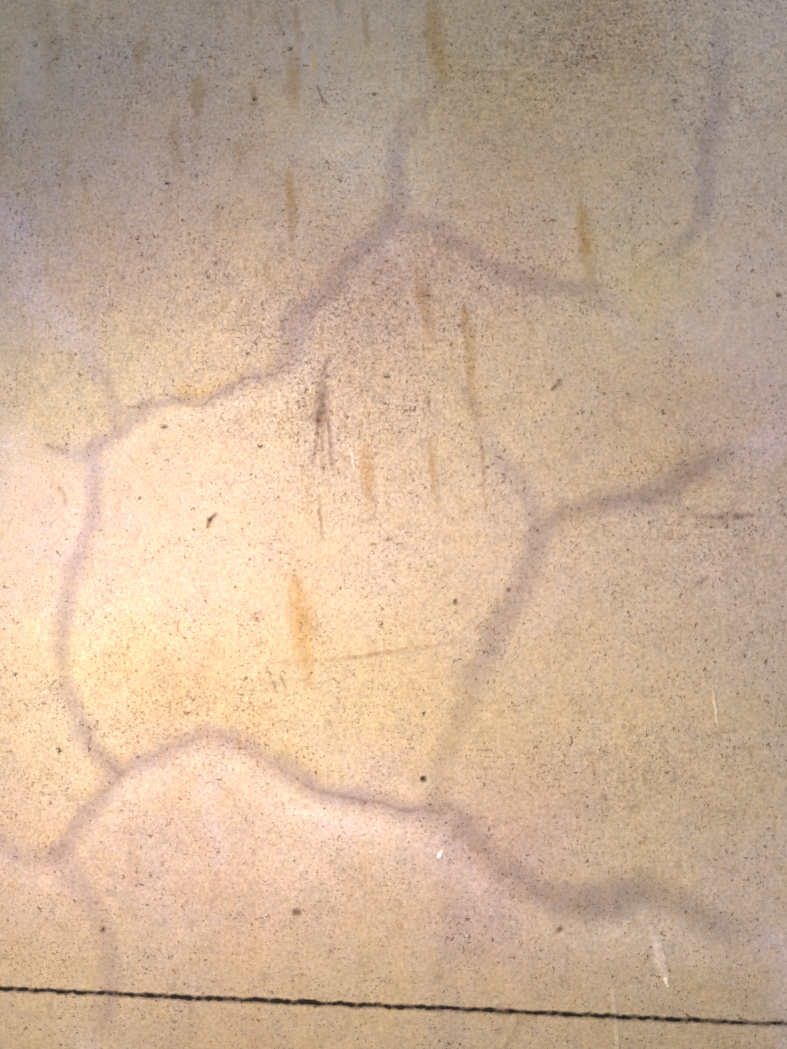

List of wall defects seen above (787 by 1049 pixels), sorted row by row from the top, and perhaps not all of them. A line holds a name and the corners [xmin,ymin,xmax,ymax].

corrosion [421,0,454,88]
crack [39,80,616,481]
corrosion [573,201,598,289]
damp [305,356,336,477]
damp [458,305,480,423]
damp [204,511,219,531]
damp [357,441,379,522]
corrosion [283,570,319,694]
crack [0,399,758,1005]
crack [87,996,123,1043]
crack [439,1011,468,1049]
damp [736,900,787,1049]